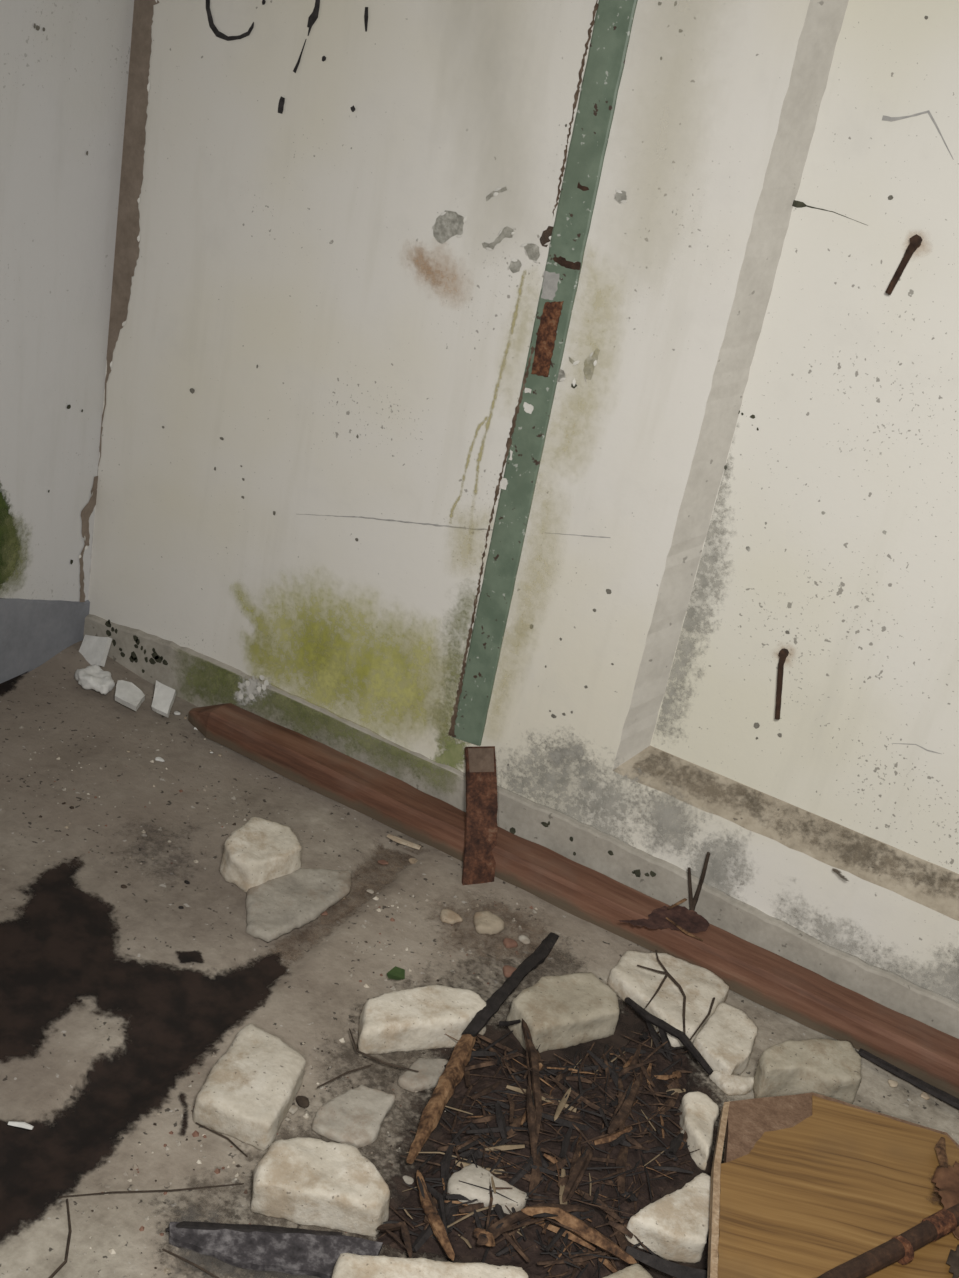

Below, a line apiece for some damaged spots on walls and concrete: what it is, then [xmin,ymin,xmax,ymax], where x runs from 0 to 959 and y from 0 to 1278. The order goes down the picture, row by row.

peeling [106,0,160,373]
peeling [79,476,98,602]
leakage [501,736,767,896]
leakage [803,821,959,890]
leakage [781,899,959,1004]